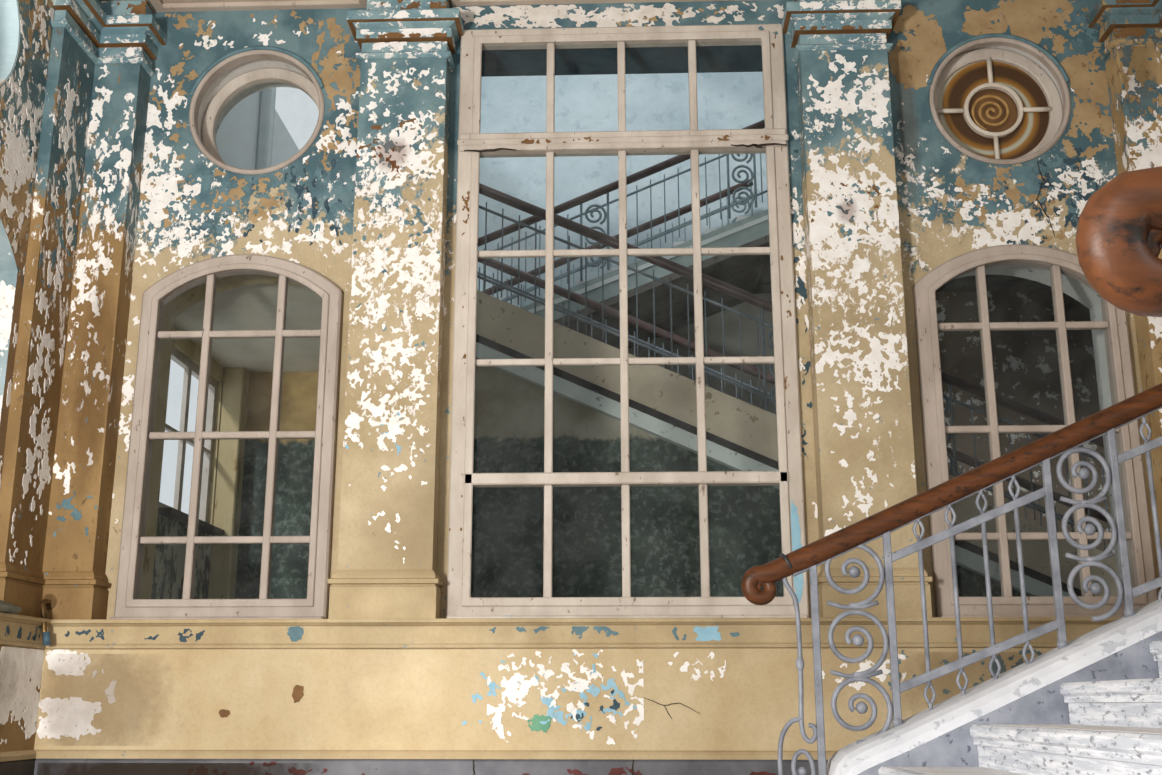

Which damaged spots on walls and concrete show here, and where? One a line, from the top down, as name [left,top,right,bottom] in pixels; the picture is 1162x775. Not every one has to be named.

peeling [0,0,785,566]
peeling [781,0,1162,536]
peeling [791,500,802,551]
peeling [794,573,804,603]
flaking render [0,646,117,744]
peeling [487,649,644,745]
peeling [668,652,726,681]
peeling [608,767,642,775]